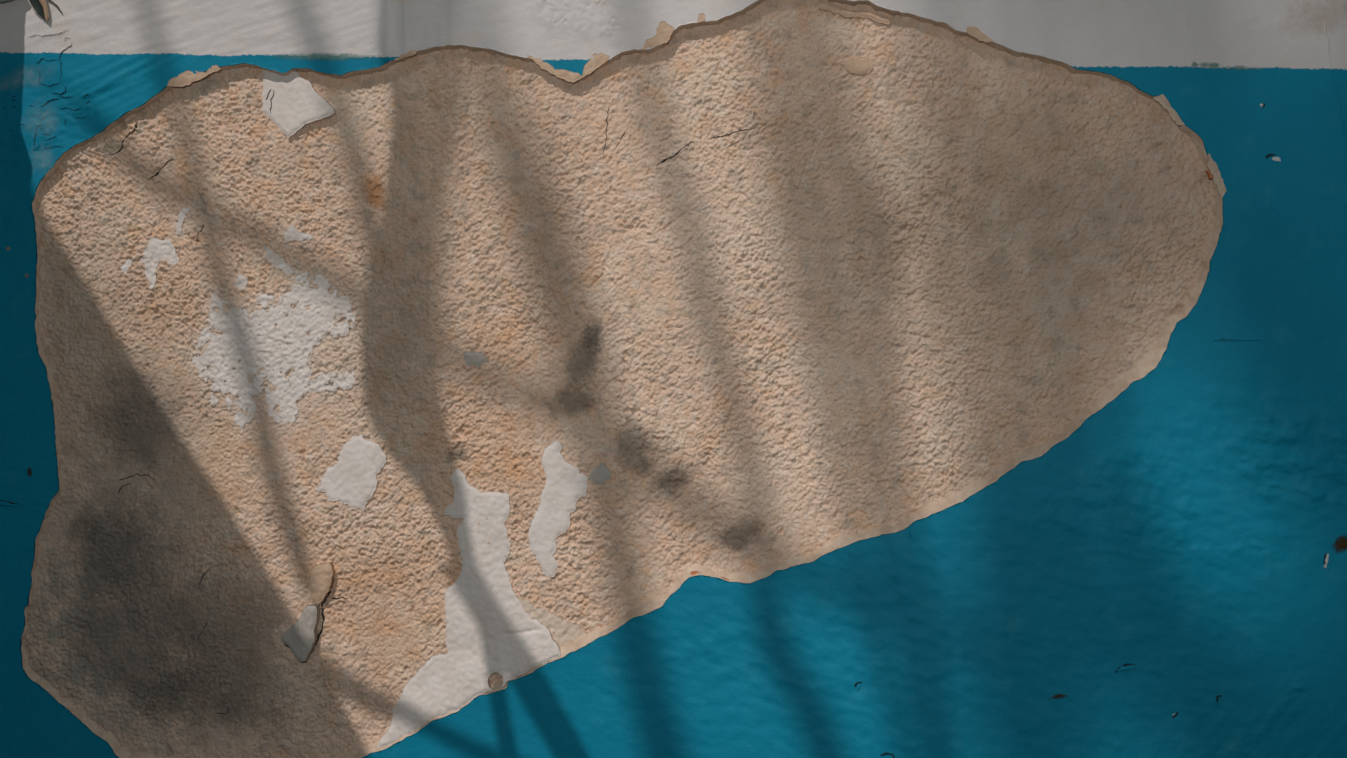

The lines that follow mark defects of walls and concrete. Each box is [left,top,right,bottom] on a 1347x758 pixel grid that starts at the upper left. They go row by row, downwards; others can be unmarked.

crack [30,30,90,149]
flaking render [261,70,337,139]
flaking render [211,45,536,79]
flaking render [817,0,1153,99]
flaking render [192,271,357,432]
flaking render [21,86,182,758]
flaking render [317,434,387,509]
flaking render [481,181,1223,695]
flaking render [281,604,320,662]
flaking render [309,562,335,603]
flaking render [377,468,561,747]
flaking render [348,699,473,758]